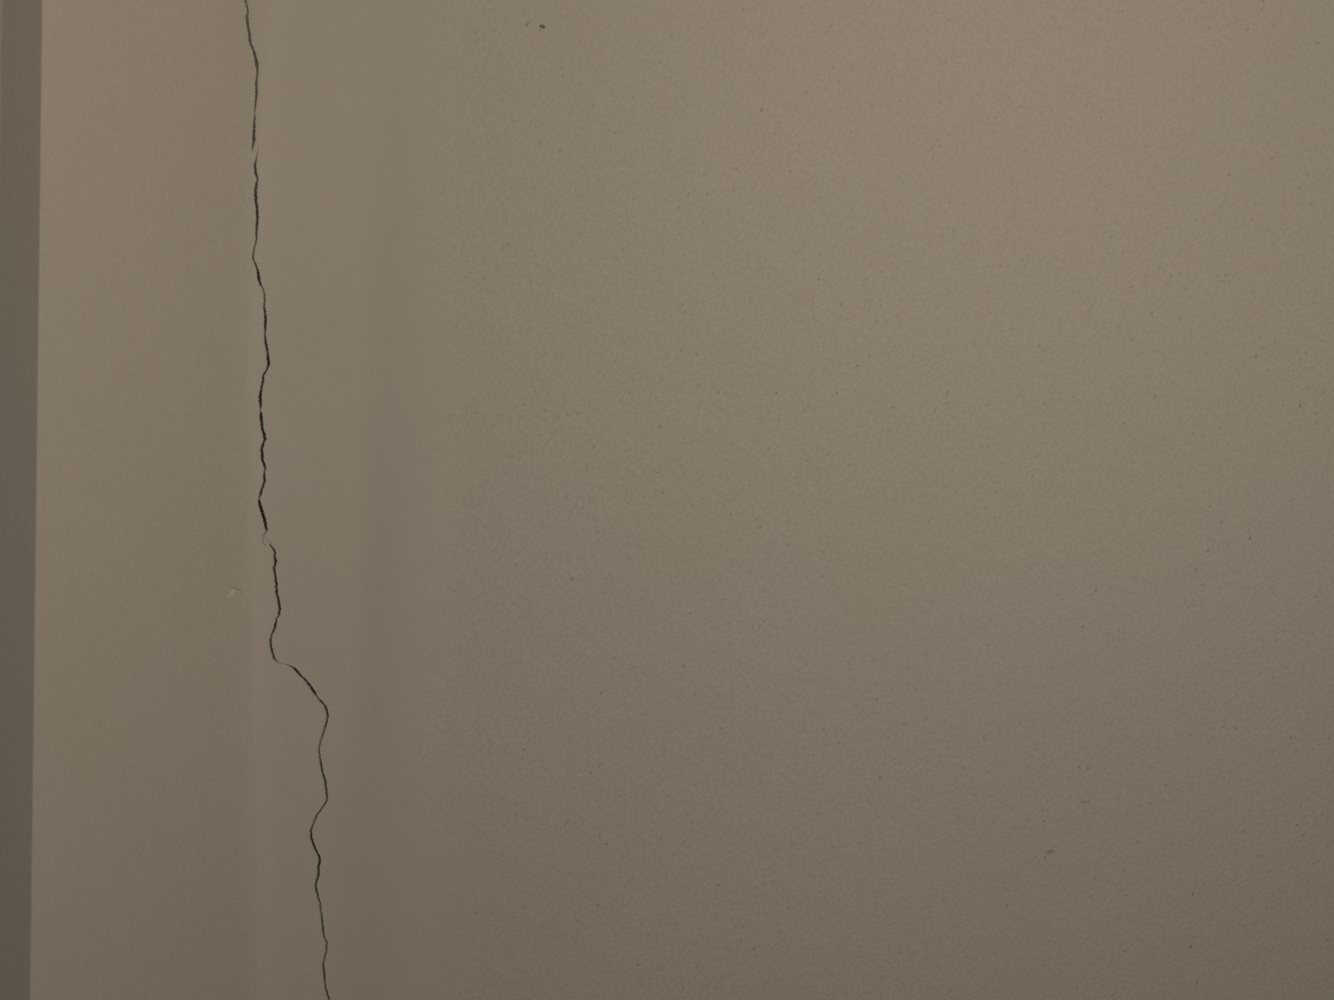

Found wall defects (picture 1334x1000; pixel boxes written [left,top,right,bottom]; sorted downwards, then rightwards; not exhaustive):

crack [242,0,332,1000]